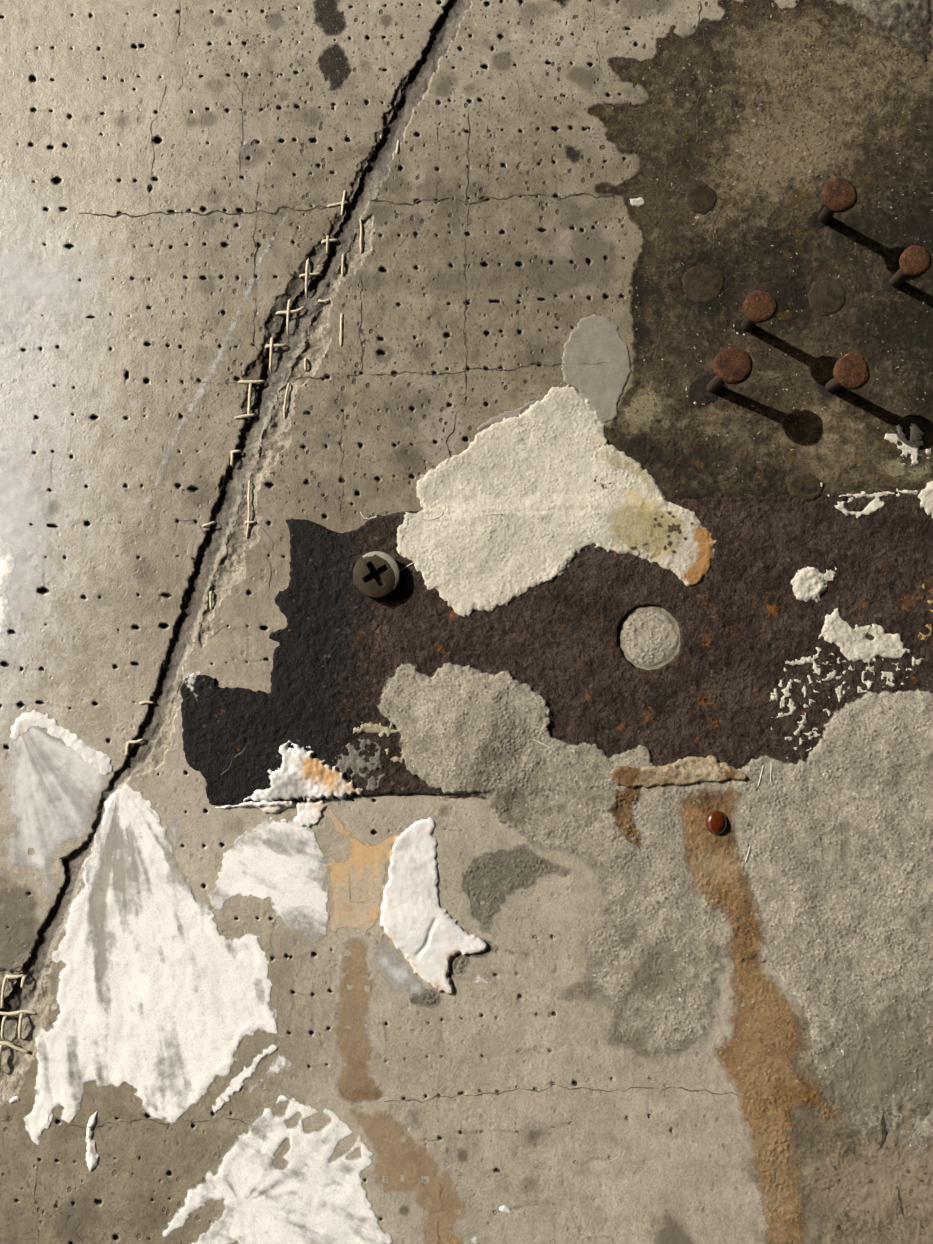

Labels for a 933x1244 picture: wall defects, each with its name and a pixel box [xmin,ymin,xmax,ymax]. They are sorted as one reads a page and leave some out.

crack [79,3,340,367]
damp [587,0,933,553]
crack [328,412,344,508]
crack [220,741,251,775]
crack [364,790,481,798]
peeling [380,817,488,995]
spalling [0,967,57,1104]
corrosion [682,790,834,1244]
crack [2,1104,250,1128]